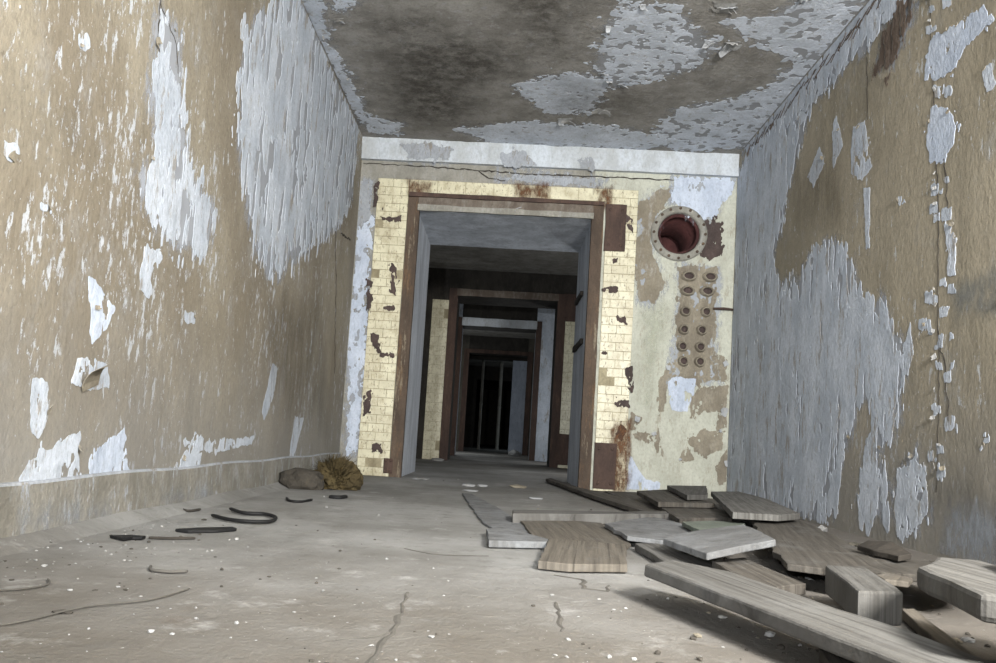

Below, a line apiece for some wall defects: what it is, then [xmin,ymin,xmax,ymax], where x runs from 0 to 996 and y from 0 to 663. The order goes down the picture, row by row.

peeling [924,4,994,81]
peeling [982,63,996,92]
peeling [924,104,961,164]
peeling [88,276,115,344]
peeling [231,0,406,456]
peeling [452,0,946,562]
peeling [944,220,957,276]
peeling [71,357,110,392]
peeling [19,377,130,482]
corrosion [611,420,632,491]
crack [336,592,410,663]